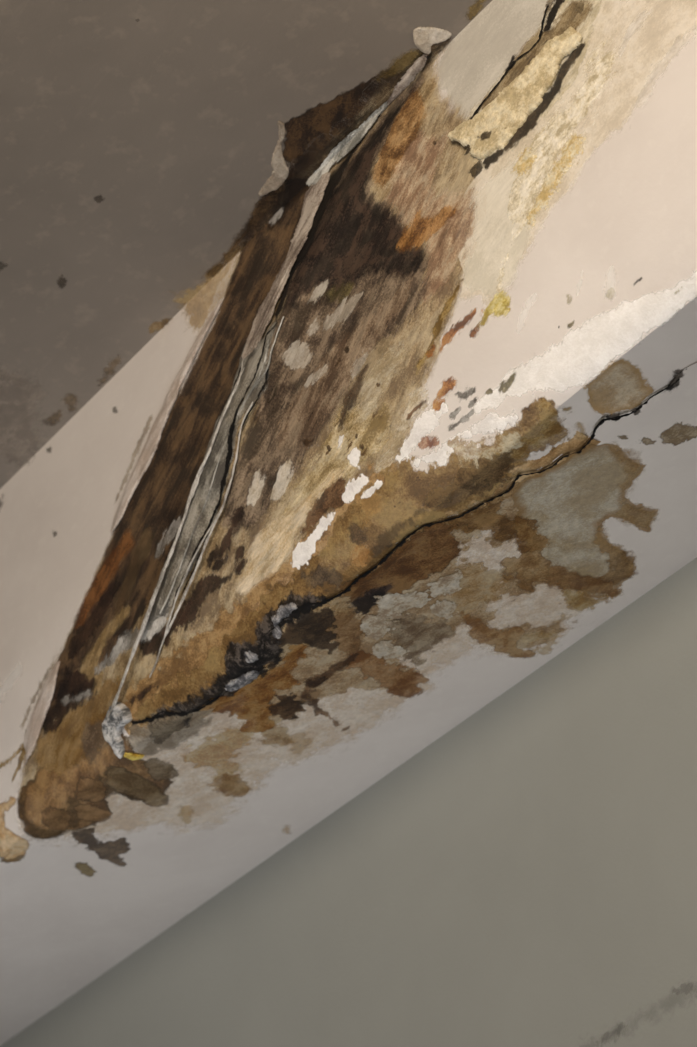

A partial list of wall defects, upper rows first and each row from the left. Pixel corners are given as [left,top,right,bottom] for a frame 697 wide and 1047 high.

peeling [20,661,90,766]
damp [0,39,658,877]
peeling [94,0,697,761]
crack [131,362,697,727]
damp [641,422,697,446]